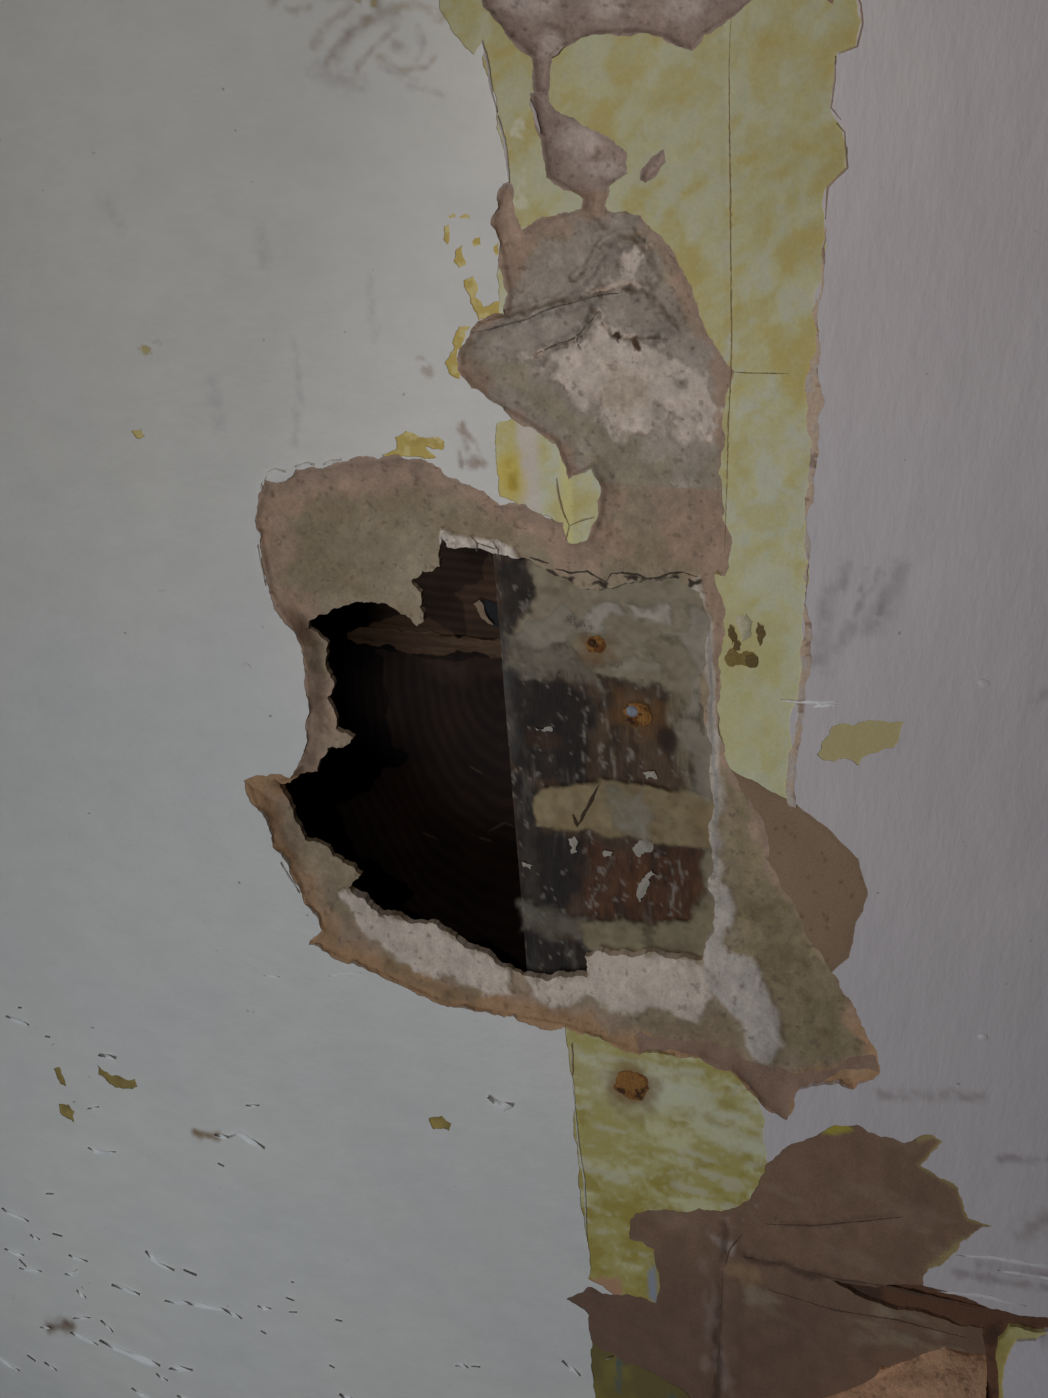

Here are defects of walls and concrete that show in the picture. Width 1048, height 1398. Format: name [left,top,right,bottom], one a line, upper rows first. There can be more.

corrosion [623,702,652,728]
peeling [244,0,1048,1398]
corrosion [614,1071,649,1101]
crack [714,1217,1048,1398]